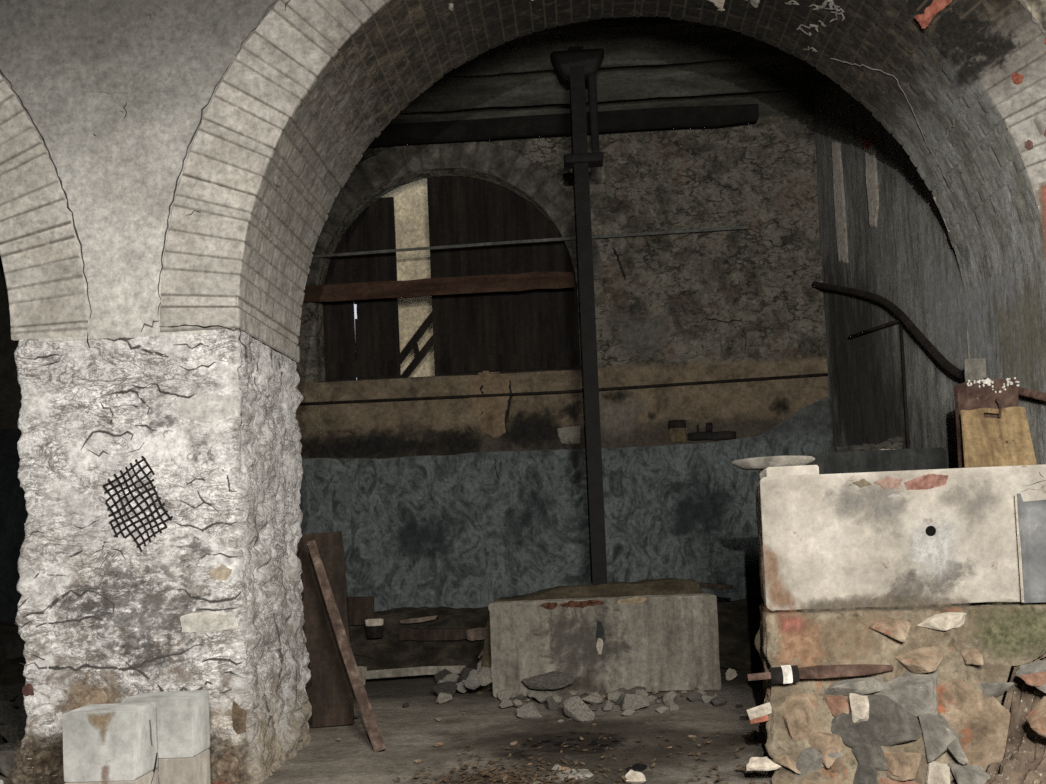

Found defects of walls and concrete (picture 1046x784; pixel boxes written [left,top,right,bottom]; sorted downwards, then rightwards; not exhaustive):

peeling [708,0,725,11]
peeling [785,0,845,52]
spalling [914,0,952,29]
spalling [1011,72,1024,85]
flaking render [831,141,849,263]
flaking render [862,134,879,227]
crack [175,469,259,558]
crack [14,519,125,627]
crack [177,589,241,611]
crack [272,554,297,696]
crack [20,629,242,694]